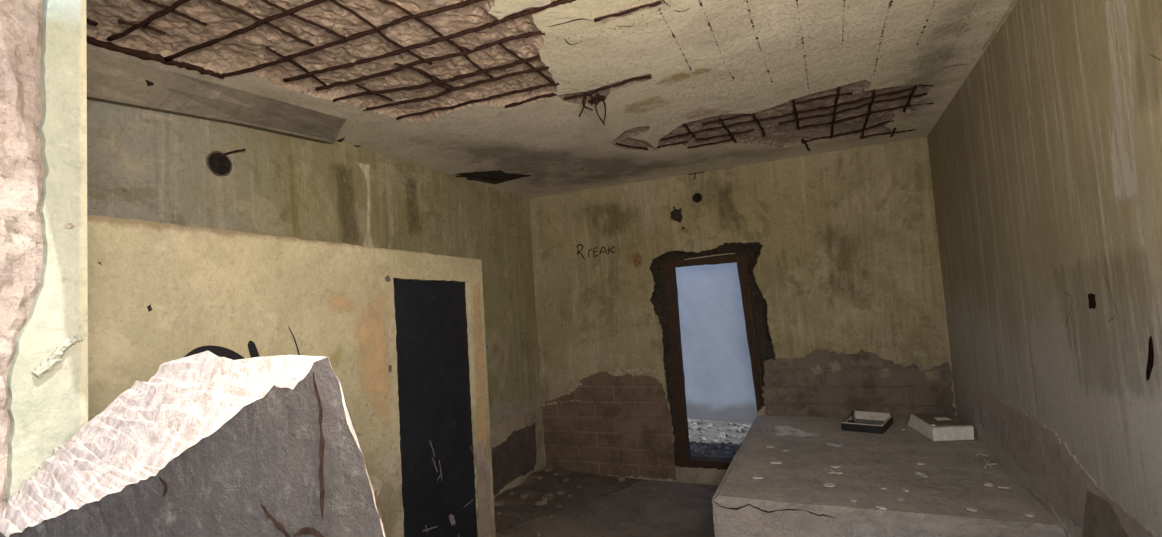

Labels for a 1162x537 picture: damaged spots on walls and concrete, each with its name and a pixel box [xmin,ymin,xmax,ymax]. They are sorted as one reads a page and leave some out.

spalling [594,0,664,24]
spalling [86,0,652,125]
spalling [611,79,934,151]
flaking render [474,242,1160,537]
crack [714,501,836,518]